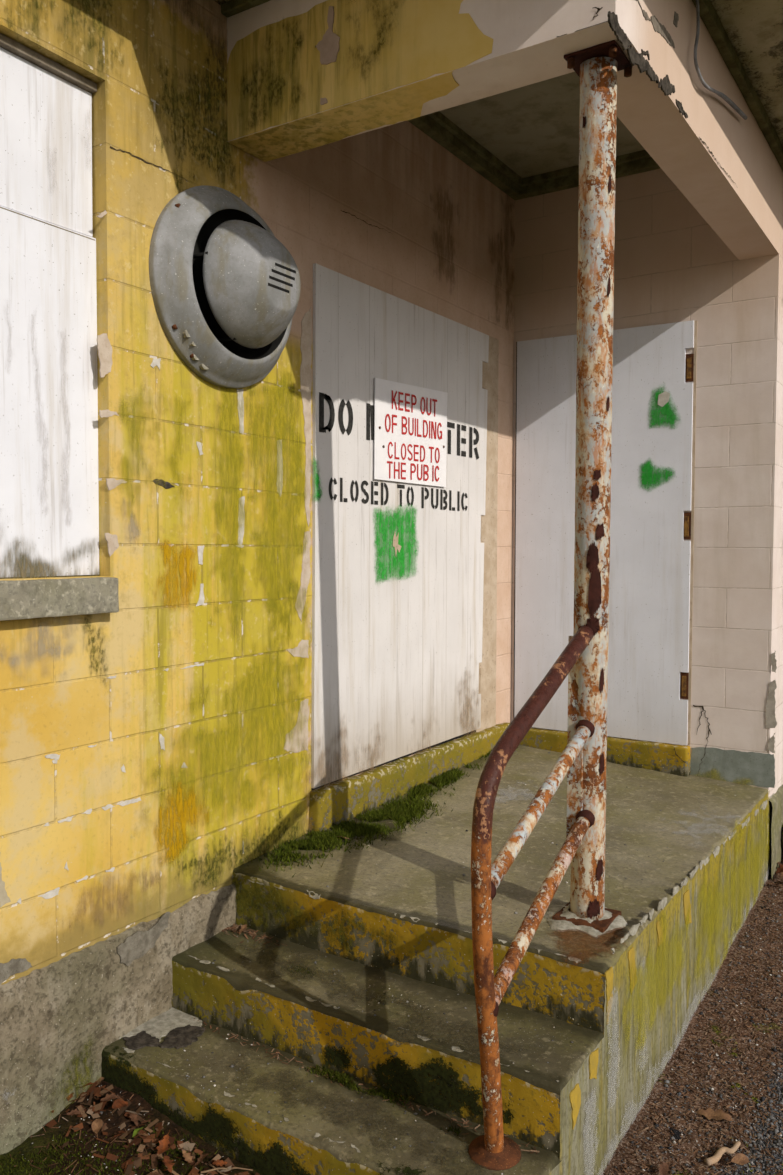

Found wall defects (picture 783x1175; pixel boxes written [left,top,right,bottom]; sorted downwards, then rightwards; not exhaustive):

peeling [227,0,493,162]
spalling [557,11,688,118]
peeling [636,0,679,48]
damp [218,378,306,618]
corrosion [591,469,601,502]
corrosion [586,523,604,635]
damp [156,658,300,806]
peeling [0,863,21,907]
peeling [38,887,60,899]
corrosion [553,927,623,963]
corrosion [587,899,600,919]
peeling [569,1048,599,1130]